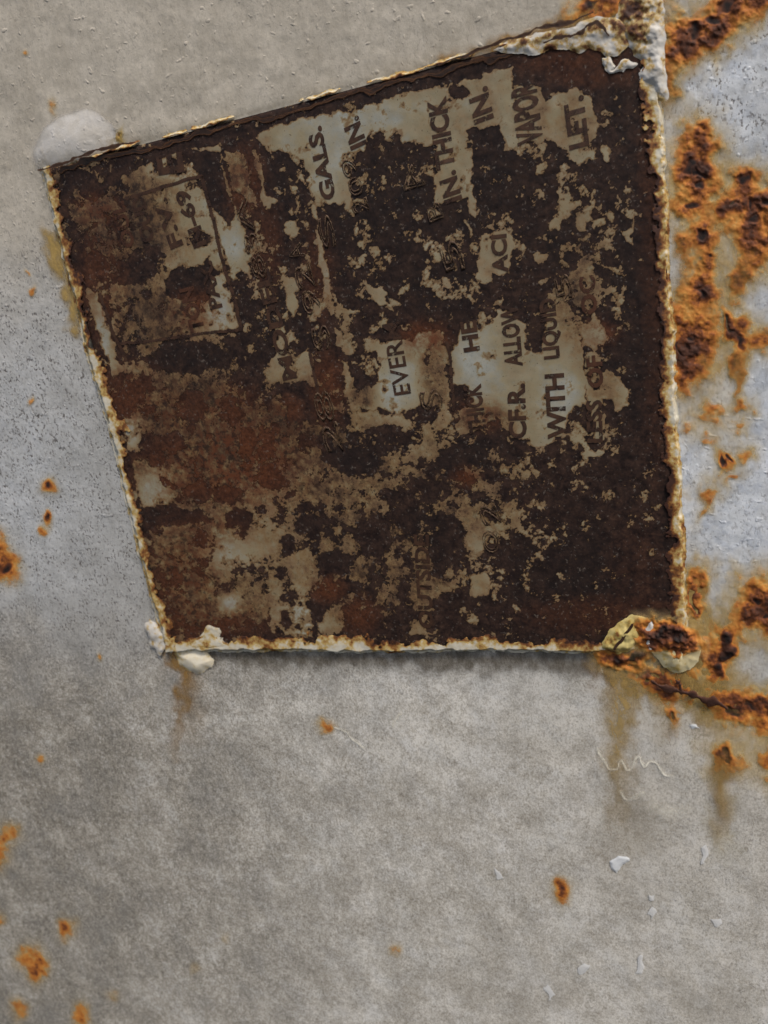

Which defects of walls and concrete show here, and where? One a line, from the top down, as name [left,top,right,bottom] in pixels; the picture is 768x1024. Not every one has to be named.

corrosion [664,0,768,100]
corrosion [59,0,620,174]
corrosion [669,118,768,479]
corrosion [41,478,57,492]
corrosion [700,489,717,515]
corrosion [0,531,20,584]
corrosion [593,566,768,805]
crack [650,680,728,710]
corrosion [0,825,18,865]
corrosion [553,877,570,904]
corrosion [59,920,72,936]
corrosion [15,946,49,982]